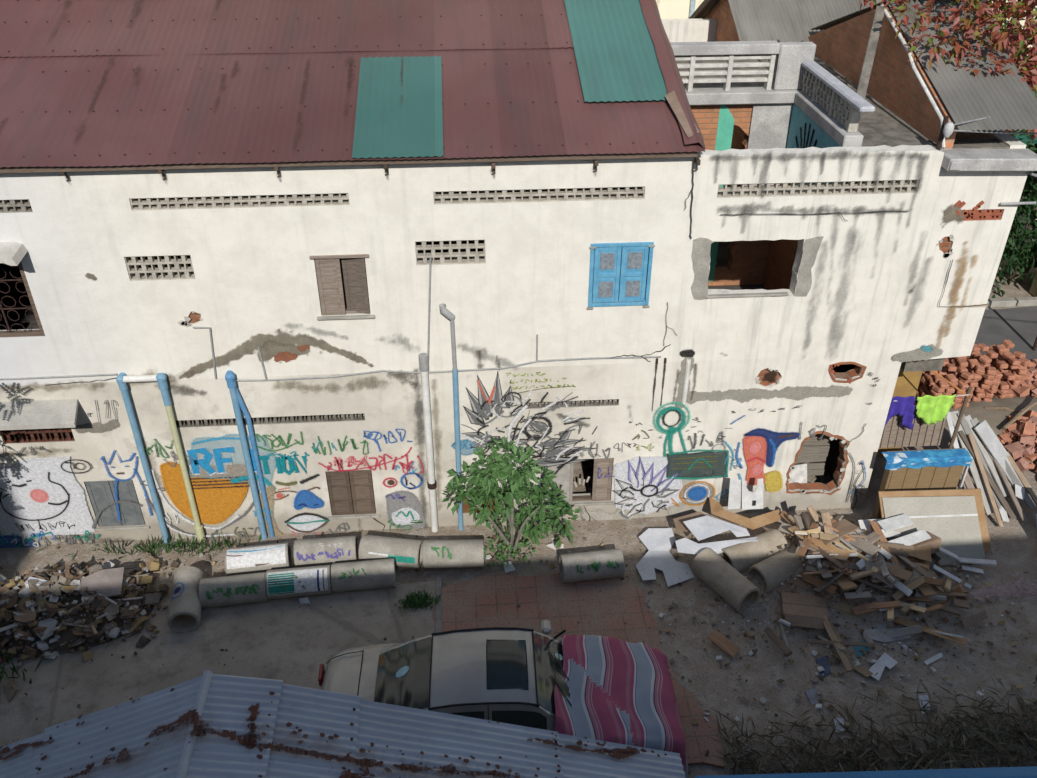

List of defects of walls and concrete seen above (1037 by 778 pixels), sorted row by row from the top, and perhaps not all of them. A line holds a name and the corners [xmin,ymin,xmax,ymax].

water stain [864,154,925,190]
flaking render [937,200,985,259]
flaking render [179,329,373,379]
spalling [755,368,781,386]
spalling [828,362,867,384]
spalling [785,431,850,495]
rust [0,715,85,774]
rust [64,747,130,778]
rust [144,692,520,778]
rust [527,733,667,778]